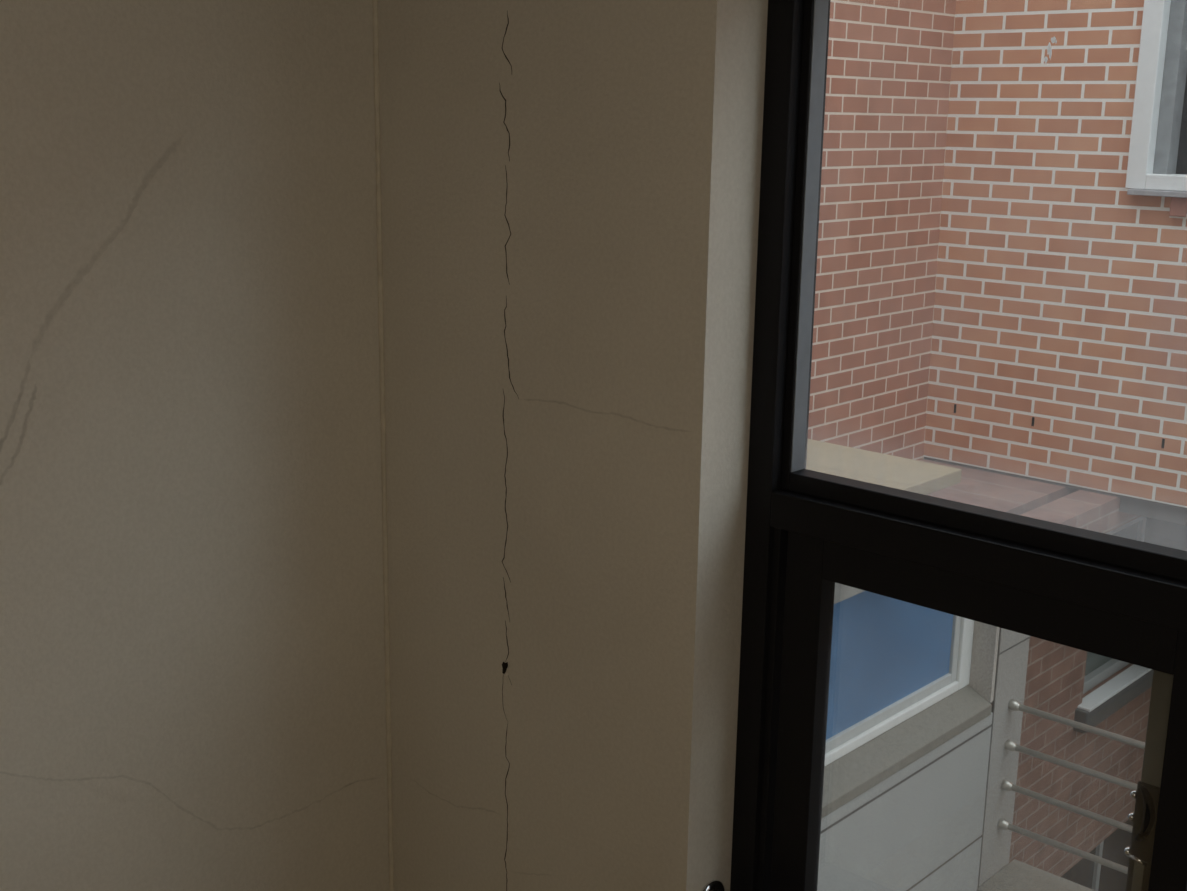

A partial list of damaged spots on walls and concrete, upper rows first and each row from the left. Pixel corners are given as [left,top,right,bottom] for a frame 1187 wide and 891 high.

crack [499,14,519,891]